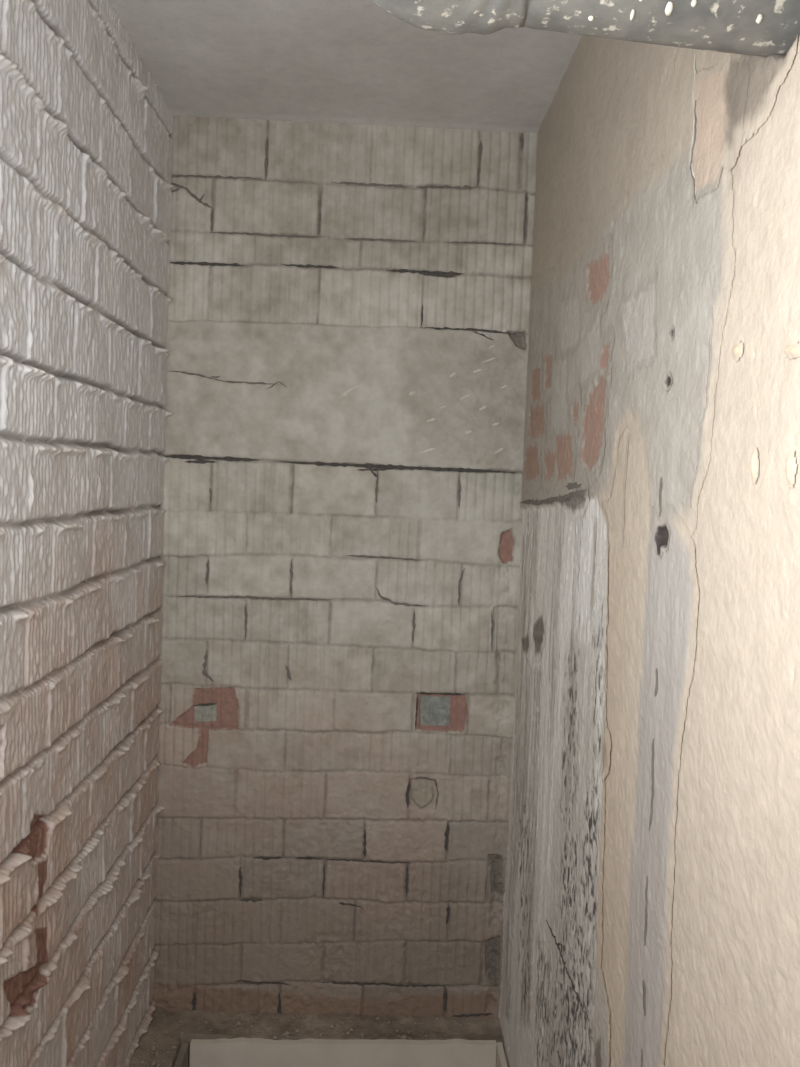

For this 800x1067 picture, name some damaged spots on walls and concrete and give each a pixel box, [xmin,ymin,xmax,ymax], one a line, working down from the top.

crack [171,136,483,238]
crack [170,259,243,267]
crack [389,269,463,278]
spalling [522,234,615,495]
crack [165,455,256,502]
crack [286,461,515,508]
crack [520,481,586,506]
spalling [495,527,518,568]
crack [170,559,330,640]
spalling [166,685,242,770]
spalling [413,690,471,736]
leakage [152,464,608,1067]